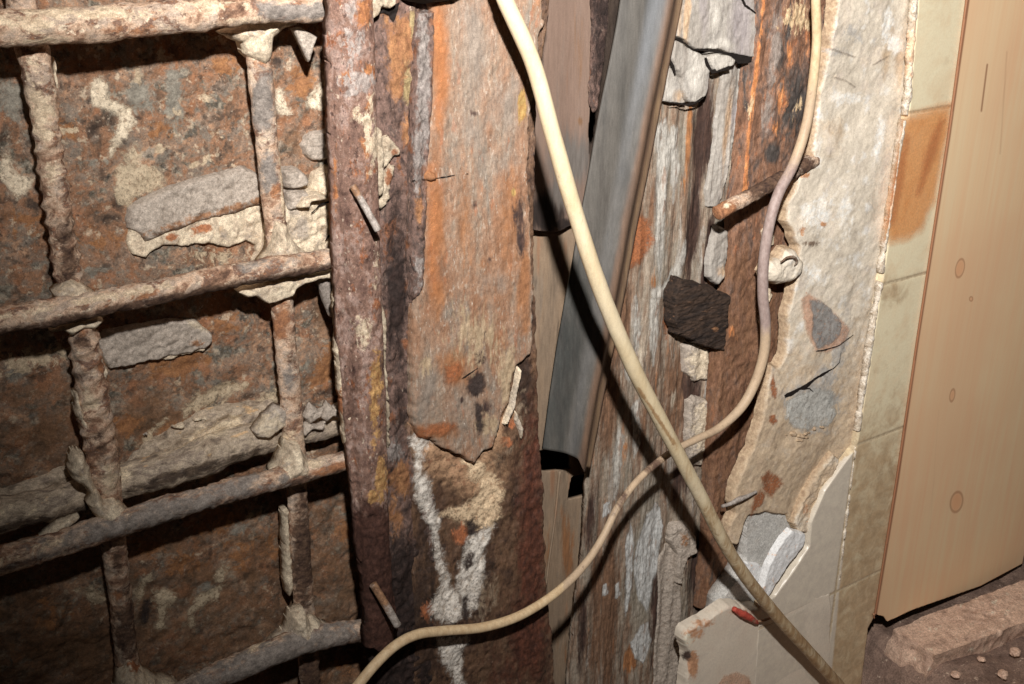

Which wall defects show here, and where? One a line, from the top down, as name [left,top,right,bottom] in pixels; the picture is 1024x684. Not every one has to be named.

spalling [290,27,317,62]
rust [515,0,545,51]
flaking render [662,0,756,207]
spalling [124,165,263,257]
rust [407,0,533,498]
rust [630,217,654,266]
peeling [234,269,332,303]
spalling [99,318,212,378]
crack [784,335,853,398]
rust [752,472,782,511]
water stain [409,434,505,623]
water stain [437,635,469,684]